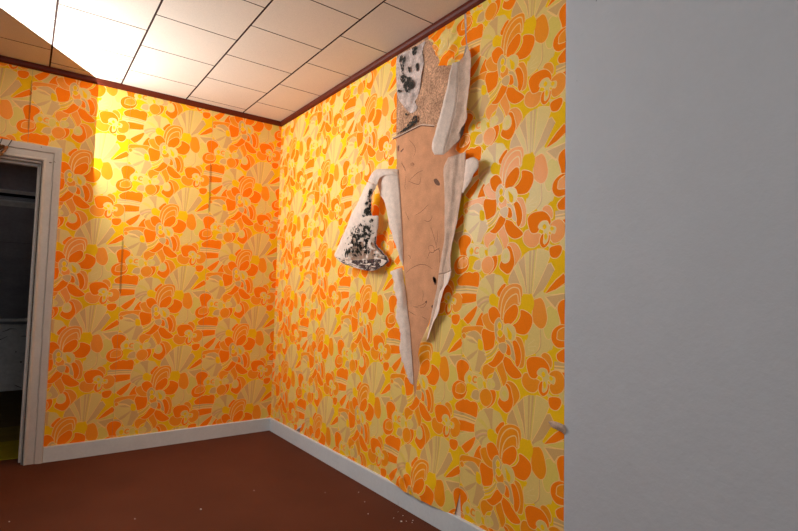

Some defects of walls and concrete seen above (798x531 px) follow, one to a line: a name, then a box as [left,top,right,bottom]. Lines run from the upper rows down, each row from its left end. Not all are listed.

mould [397,46,418,93]
flaking render [396,37,452,137]
mould [336,189,388,271]